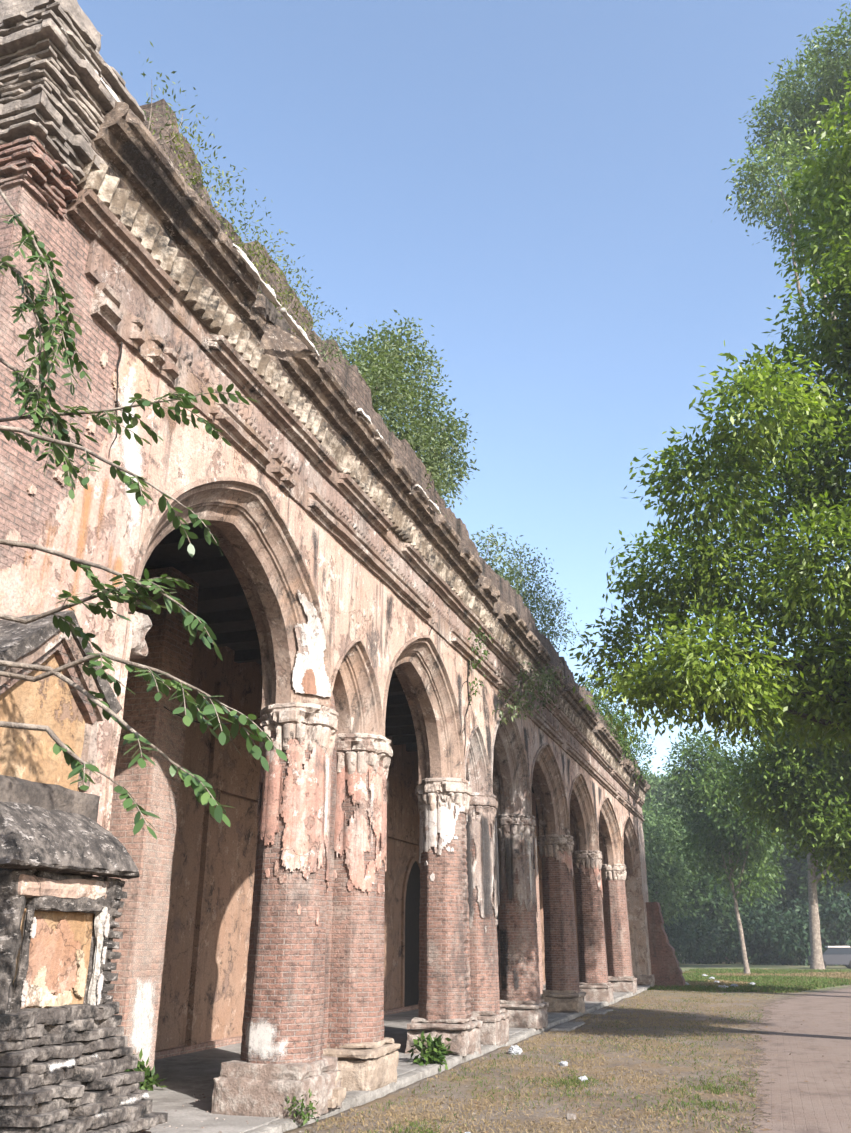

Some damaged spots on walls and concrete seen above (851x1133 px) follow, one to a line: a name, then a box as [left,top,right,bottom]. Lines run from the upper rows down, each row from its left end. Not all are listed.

peeling [257,739,387,895]
peeling [419,803,603,933]
flaking render [21,913,110,1009]
leakage [246,1023,286,1058]